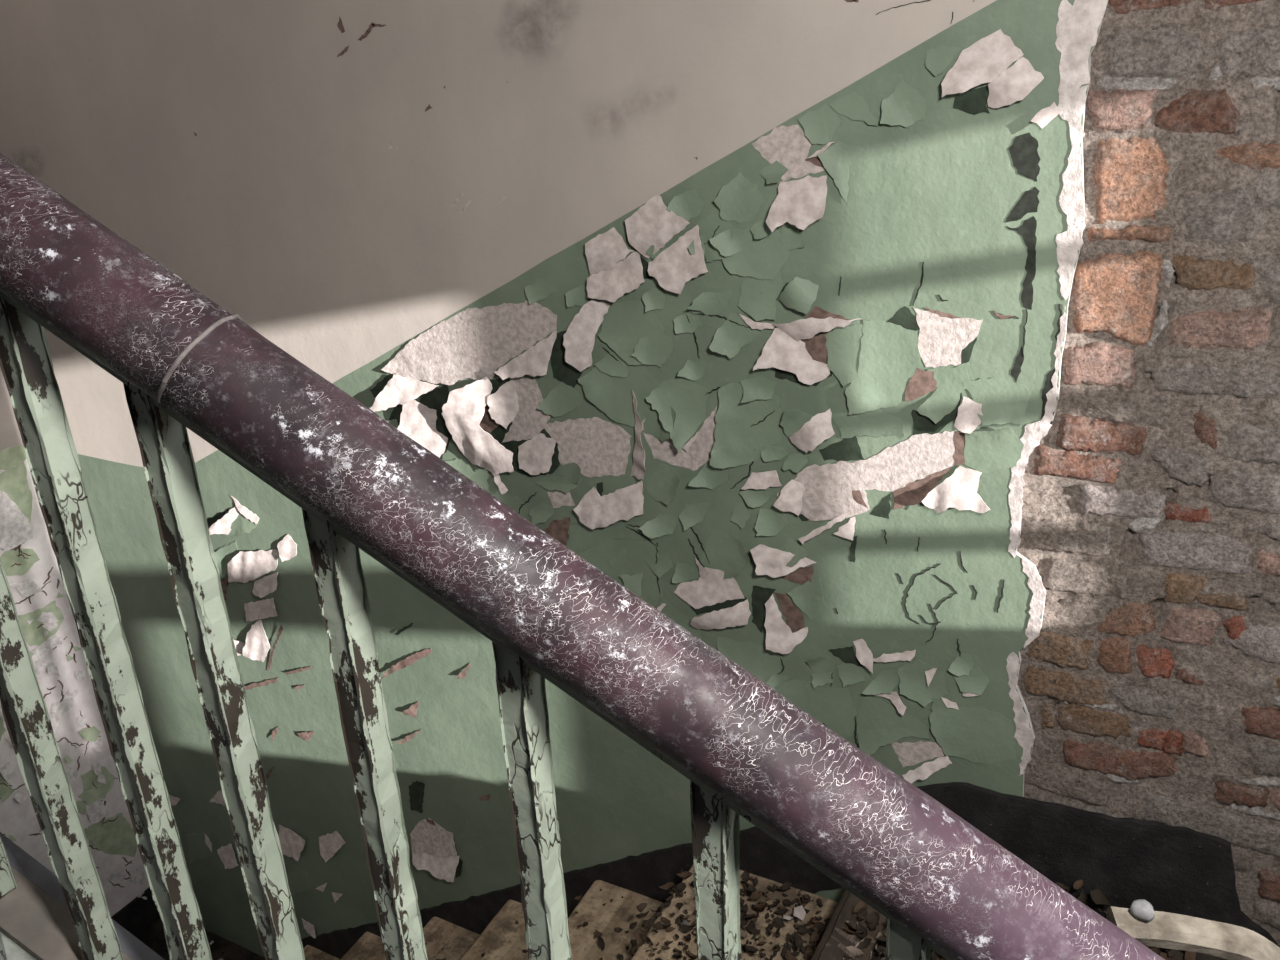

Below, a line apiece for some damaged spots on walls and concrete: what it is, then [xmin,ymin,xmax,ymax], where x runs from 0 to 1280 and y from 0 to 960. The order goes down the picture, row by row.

flaking render [337,16,387,57]
peeling [369,0,1108,784]
peeling [207,496,311,691]
crack [884,530,1005,657]
peeling [186,831,238,869]
peeling [279,825,346,902]
peeling [409,781,463,882]
peeling [301,918,316,938]